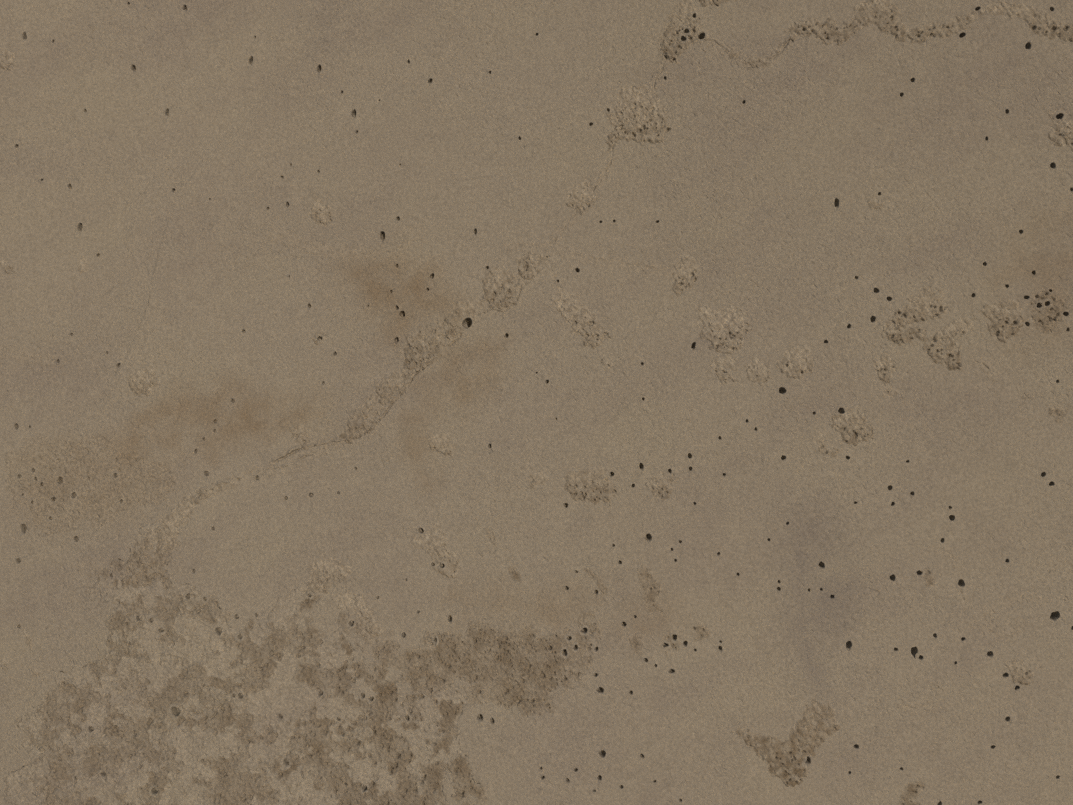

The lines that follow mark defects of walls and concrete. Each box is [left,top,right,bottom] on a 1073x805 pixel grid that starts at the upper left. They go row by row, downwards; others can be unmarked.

crack [641,0,1073,108]
spalling [605,83,672,152]
crack [121,134,621,589]
spalling [696,303,753,359]
spalling [872,285,1065,384]
spalling [563,461,618,507]
spalling [3,522,603,805]
spalling [736,695,841,791]